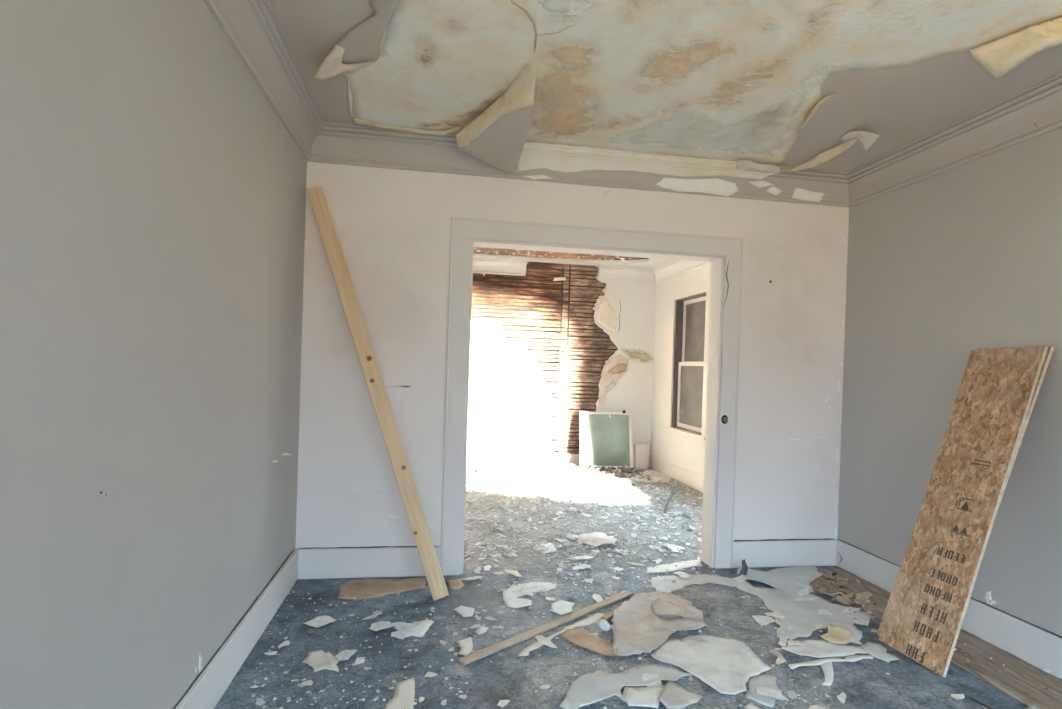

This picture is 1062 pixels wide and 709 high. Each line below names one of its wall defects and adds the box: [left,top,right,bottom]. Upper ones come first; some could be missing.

crack [511,0,572,52]
peeling [314,0,1062,202]
flaking render [467,247,649,454]